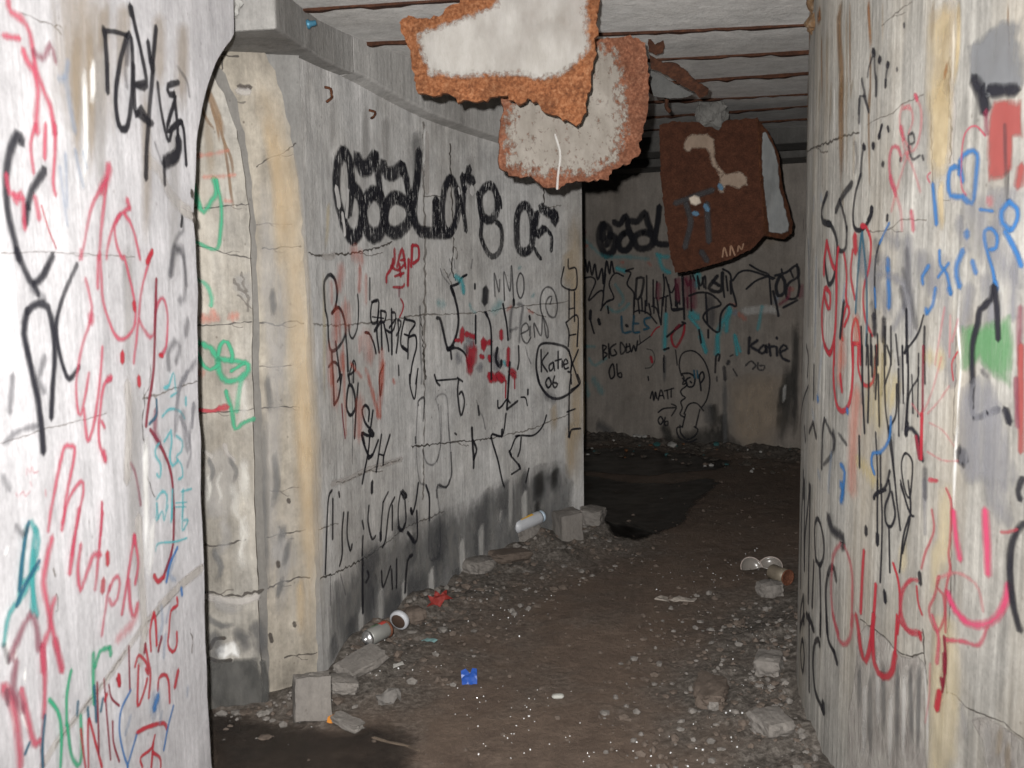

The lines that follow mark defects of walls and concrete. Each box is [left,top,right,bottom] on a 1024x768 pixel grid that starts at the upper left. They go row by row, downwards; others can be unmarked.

rust [367,40,407,48]
rust [599,9,822,132]
crack [2,413,106,443]
crack [40,122,568,768]
leakage [333,469,569,645]